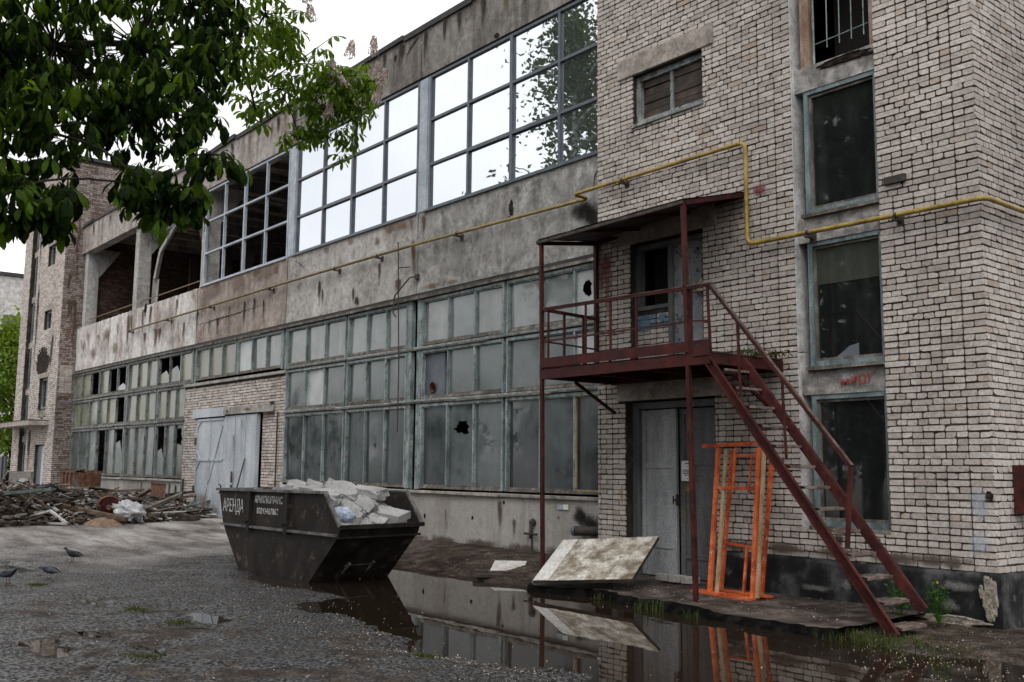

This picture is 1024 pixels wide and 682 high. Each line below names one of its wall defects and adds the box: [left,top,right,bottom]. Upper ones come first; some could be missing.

leakage [81,306,161,356]
leakage [182,286,229,337]
spalling [914,576,999,627]